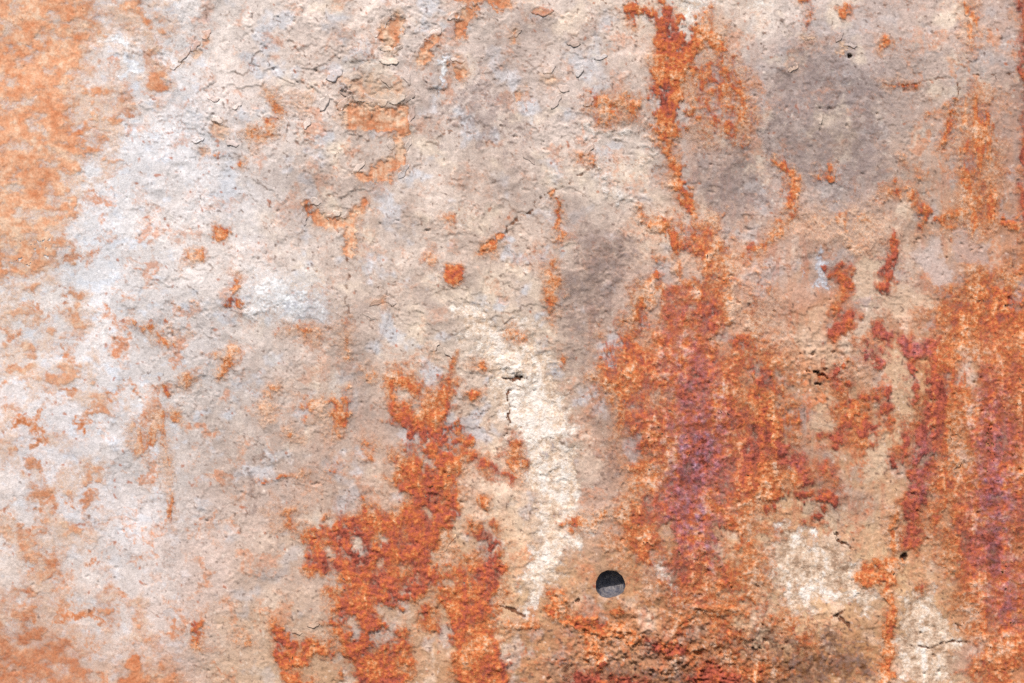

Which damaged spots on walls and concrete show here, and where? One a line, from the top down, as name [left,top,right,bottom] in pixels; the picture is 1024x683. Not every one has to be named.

rust [0,0,173,329]
rust [258,0,1024,683]